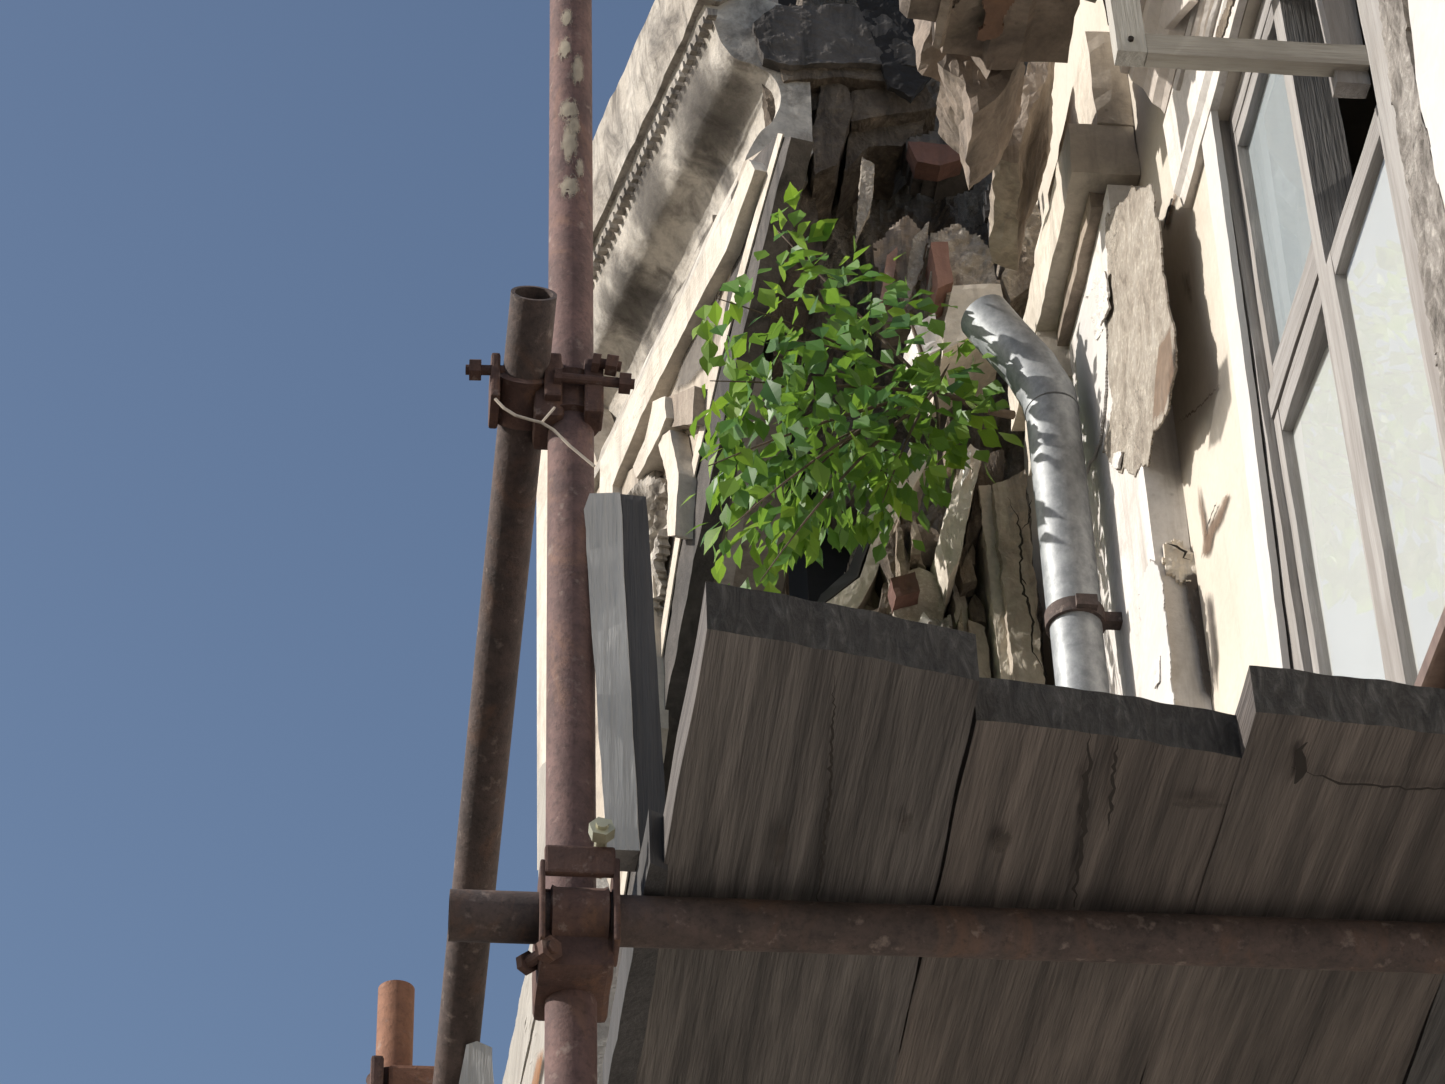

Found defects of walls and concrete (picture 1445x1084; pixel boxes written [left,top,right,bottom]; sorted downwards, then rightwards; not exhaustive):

flaking render [952,0,1015,41]
water stain [667,65,747,150]
water stain [632,161,668,235]
water stain [709,165,731,196]
flaking render [899,131,974,202]
flaking render [855,157,1000,349]
water stain [600,263,685,356]
water stain [675,287,721,389]
flaking render [961,449,972,486]
flaking render [885,572,920,616]